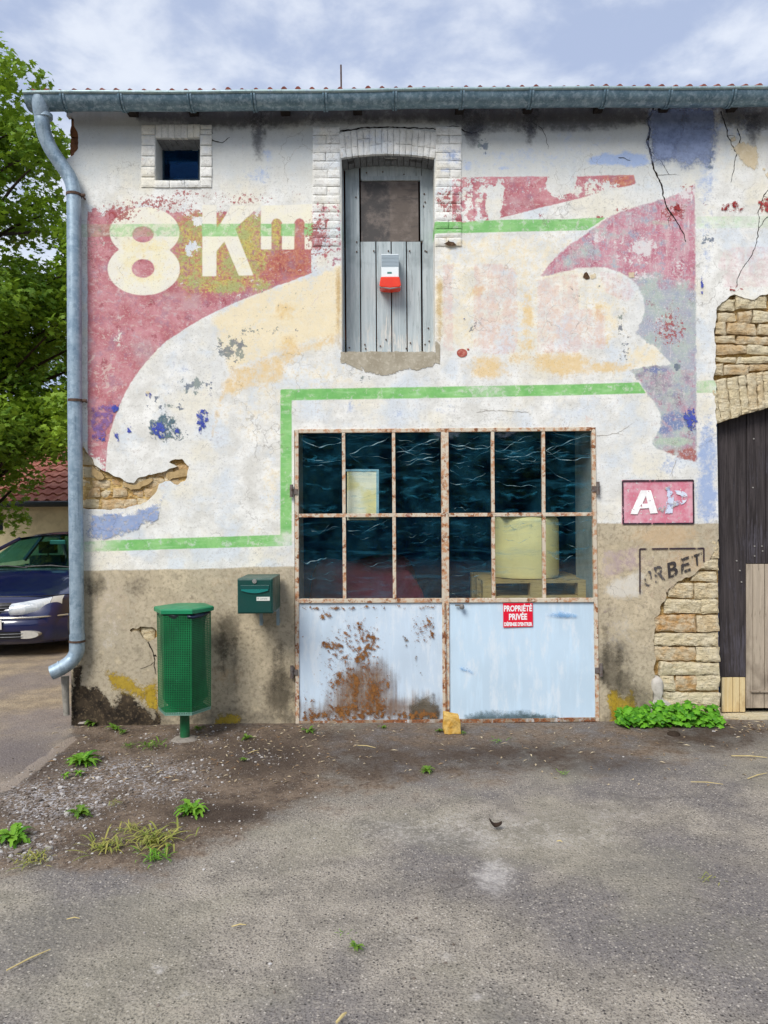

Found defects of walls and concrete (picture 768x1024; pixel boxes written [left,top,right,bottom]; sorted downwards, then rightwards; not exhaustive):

leakage [139,108,646,148]
crack [618,108,686,242]
crack [720,111,741,181]
crack [737,190,768,285]
flaking render [712,289,768,423]
flaking render [83,447,189,540]
leakage [71,665,161,726]
flaking render [131,627,157,641]
rust [302,605,439,721]
flaking render [651,540,721,716]